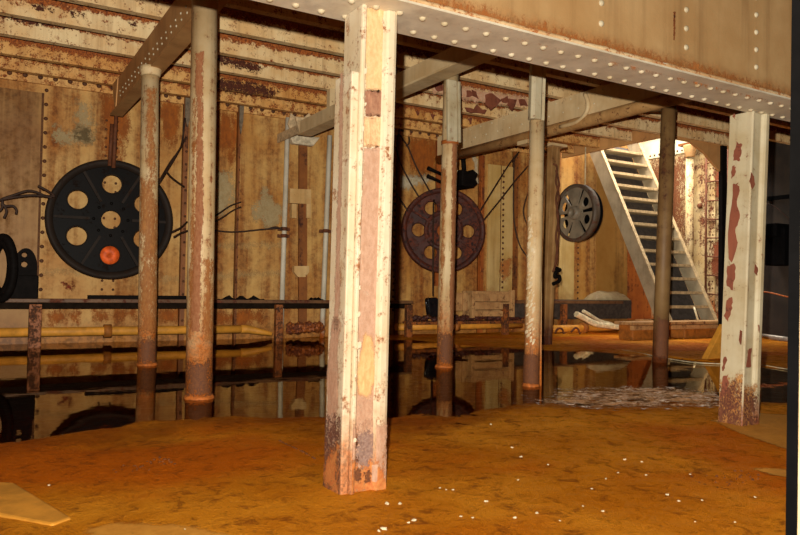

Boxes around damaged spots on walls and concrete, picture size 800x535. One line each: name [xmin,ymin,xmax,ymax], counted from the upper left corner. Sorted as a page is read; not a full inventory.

corrosion [0,4,68,29]
corrosion [430,0,507,22]
corrosion [519,22,669,63]
corrosion [217,55,280,98]
peeling [461,86,528,124]
corrosion [92,51,264,343]
corrosion [673,155,686,243]
corrosion [351,8,387,495]
corrosion [409,137,458,366]
corrosion [710,239,718,278]
peeling [724,141,742,321]
corrosion [718,374,758,426]